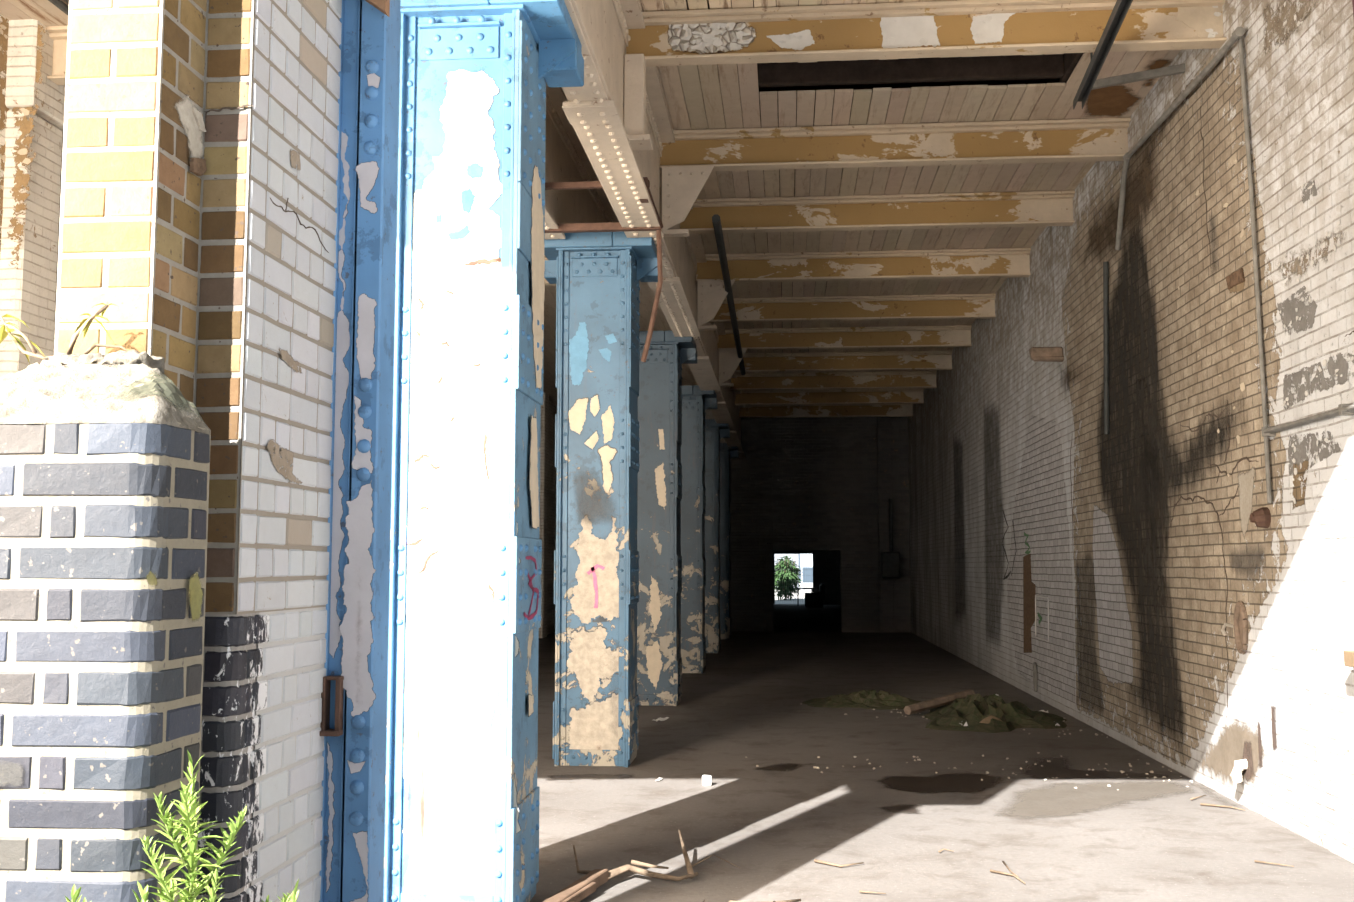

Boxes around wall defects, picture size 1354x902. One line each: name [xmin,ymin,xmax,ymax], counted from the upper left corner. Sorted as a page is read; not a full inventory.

peeling [0,15,47,269]
peeling [329,131,380,717]
peeling [529,415,540,529]
peeling [568,394,618,494]
peeling [655,429,666,510]
leakage [1086,125,1233,744]
peeling [1062,0,1354,767]
peeling [566,515,619,750]
peeling [646,576,663,689]
peeling [325,742,365,893]
peeling [350,831,369,902]